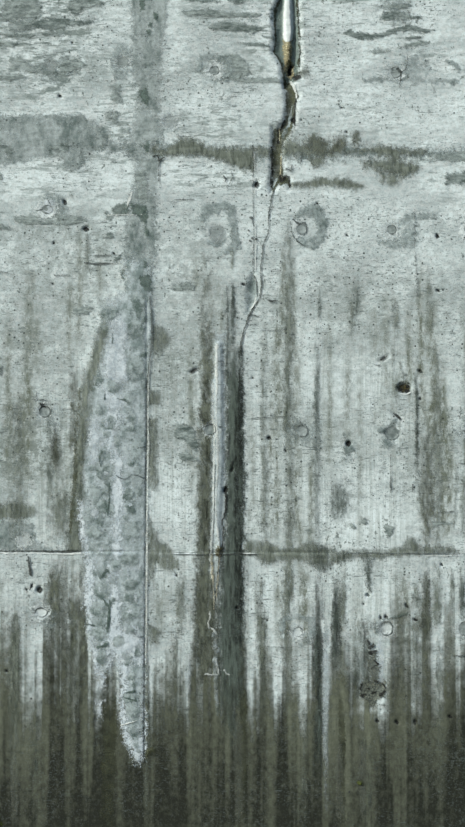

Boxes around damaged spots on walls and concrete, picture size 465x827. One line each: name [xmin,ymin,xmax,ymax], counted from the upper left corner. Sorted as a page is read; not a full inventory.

leakage [109,84,122,103]
crack [231,0,302,356]
leakage [282,132,465,192]
leakage [283,259,295,457]
leakage [259,446,268,532]
leakage [331,486,349,517]
leakage [417,417,441,542]
leakage [245,497,455,613]
leakage [432,584,442,622]
leakage [451,578,465,610]